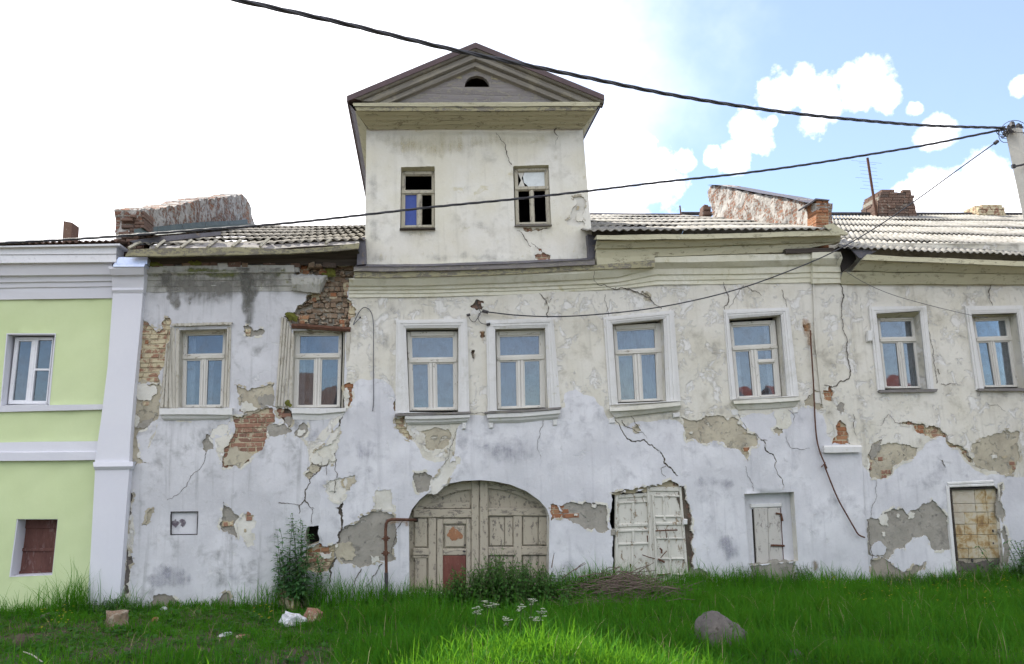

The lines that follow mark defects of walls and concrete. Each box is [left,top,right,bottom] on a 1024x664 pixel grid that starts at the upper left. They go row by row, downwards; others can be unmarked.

damp [156,267,285,324]
crack [825,284,851,387]
flaking render [133,316,172,466]
flaking render [203,382,311,470]
crack [279,453,402,595]
flaking render [302,487,397,576]
flaking render [393,401,461,495]
flaking render [549,478,709,584]
crack [615,416,677,476]
flaking render [679,415,760,461]
flaking render [867,498,950,581]
flaking render [900,420,1022,569]